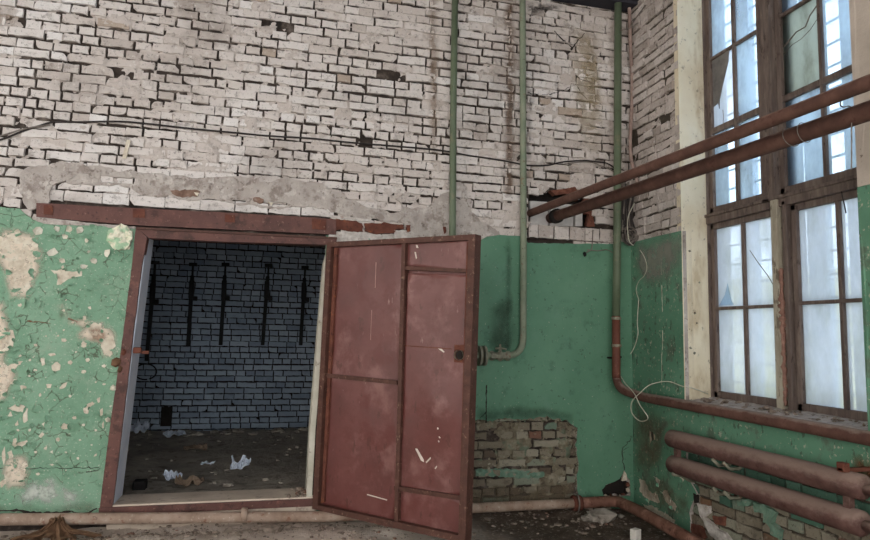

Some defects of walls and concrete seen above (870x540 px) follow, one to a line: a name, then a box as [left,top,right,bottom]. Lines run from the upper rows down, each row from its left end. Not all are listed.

damp [505,3,513,67]
spalling [170,189,200,198]
spalling [548,187,588,202]
corrosion [328,215,417,242]
spalling [582,210,595,227]
crack [24,317,79,325]
peeling [0,224,126,488]
crack [31,466,99,474]
flaking render [473,416,578,511]
peeling [602,471,677,523]
flaking render [691,493,733,540]
flaking render [737,498,784,540]